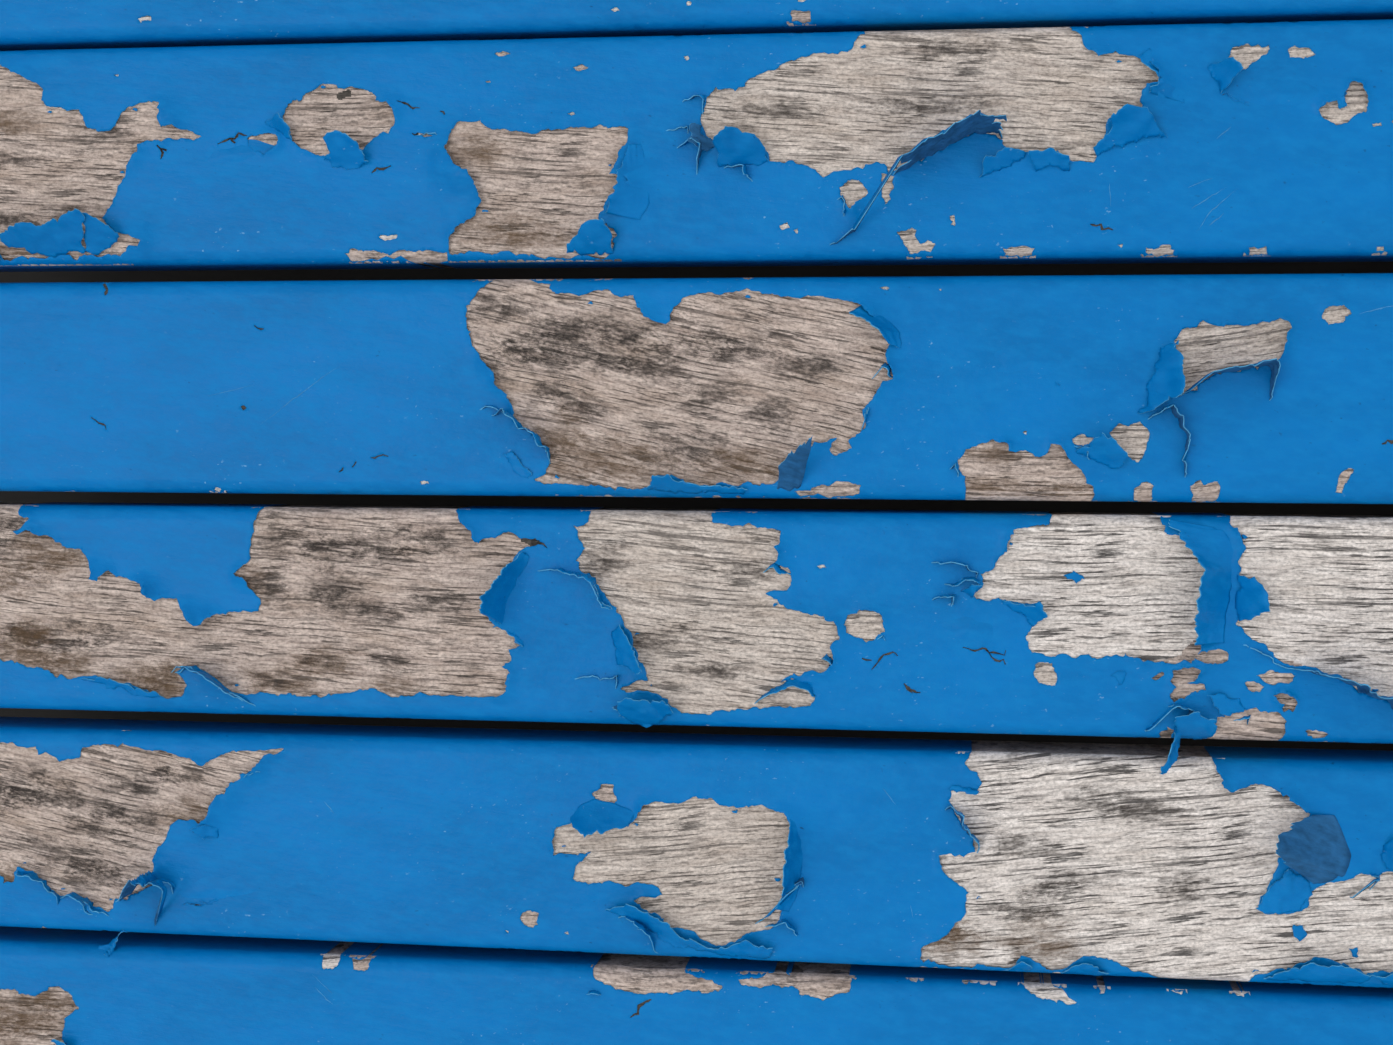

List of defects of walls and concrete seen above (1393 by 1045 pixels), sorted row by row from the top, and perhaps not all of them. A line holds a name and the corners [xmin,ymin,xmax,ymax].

peeling [0,65,201,266]
peeling [248,84,395,170]
peeling [346,112,650,264]
peeling [897,228,935,259]
peeling [666,26,1184,245]
peeling [1319,81,1393,127]
peeling [0,278,901,728]
peeling [907,318,1393,1005]
peeling [0,986,79,1045]
peeling [98,929,128,957]
peeling [0,730,290,925]
peeling [552,784,856,1001]